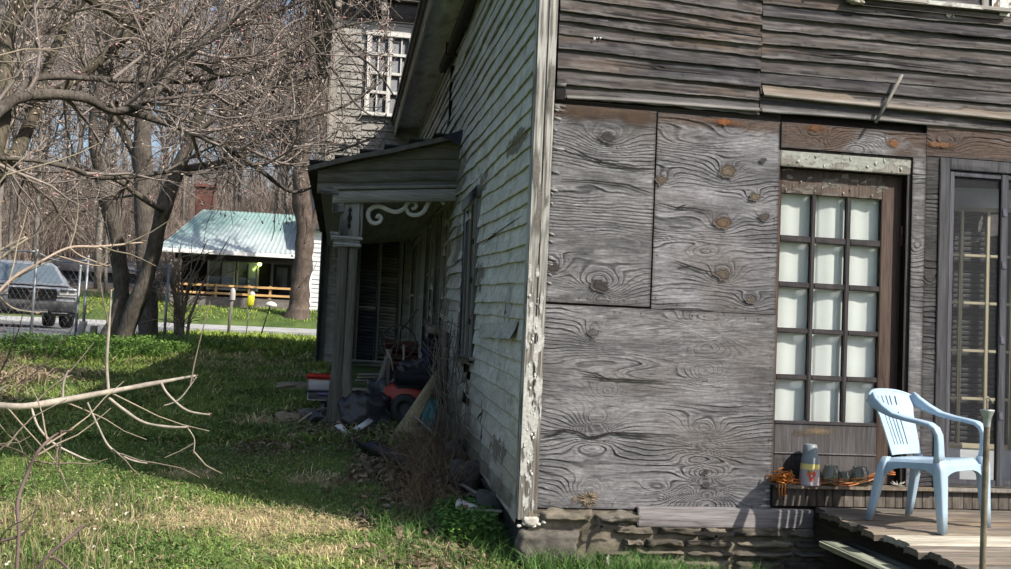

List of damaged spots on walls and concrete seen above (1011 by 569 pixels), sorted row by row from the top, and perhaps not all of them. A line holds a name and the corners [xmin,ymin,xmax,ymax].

peeling [506,41,566,243]
peeling [782,150,911,199]
peeling [515,249,554,528]